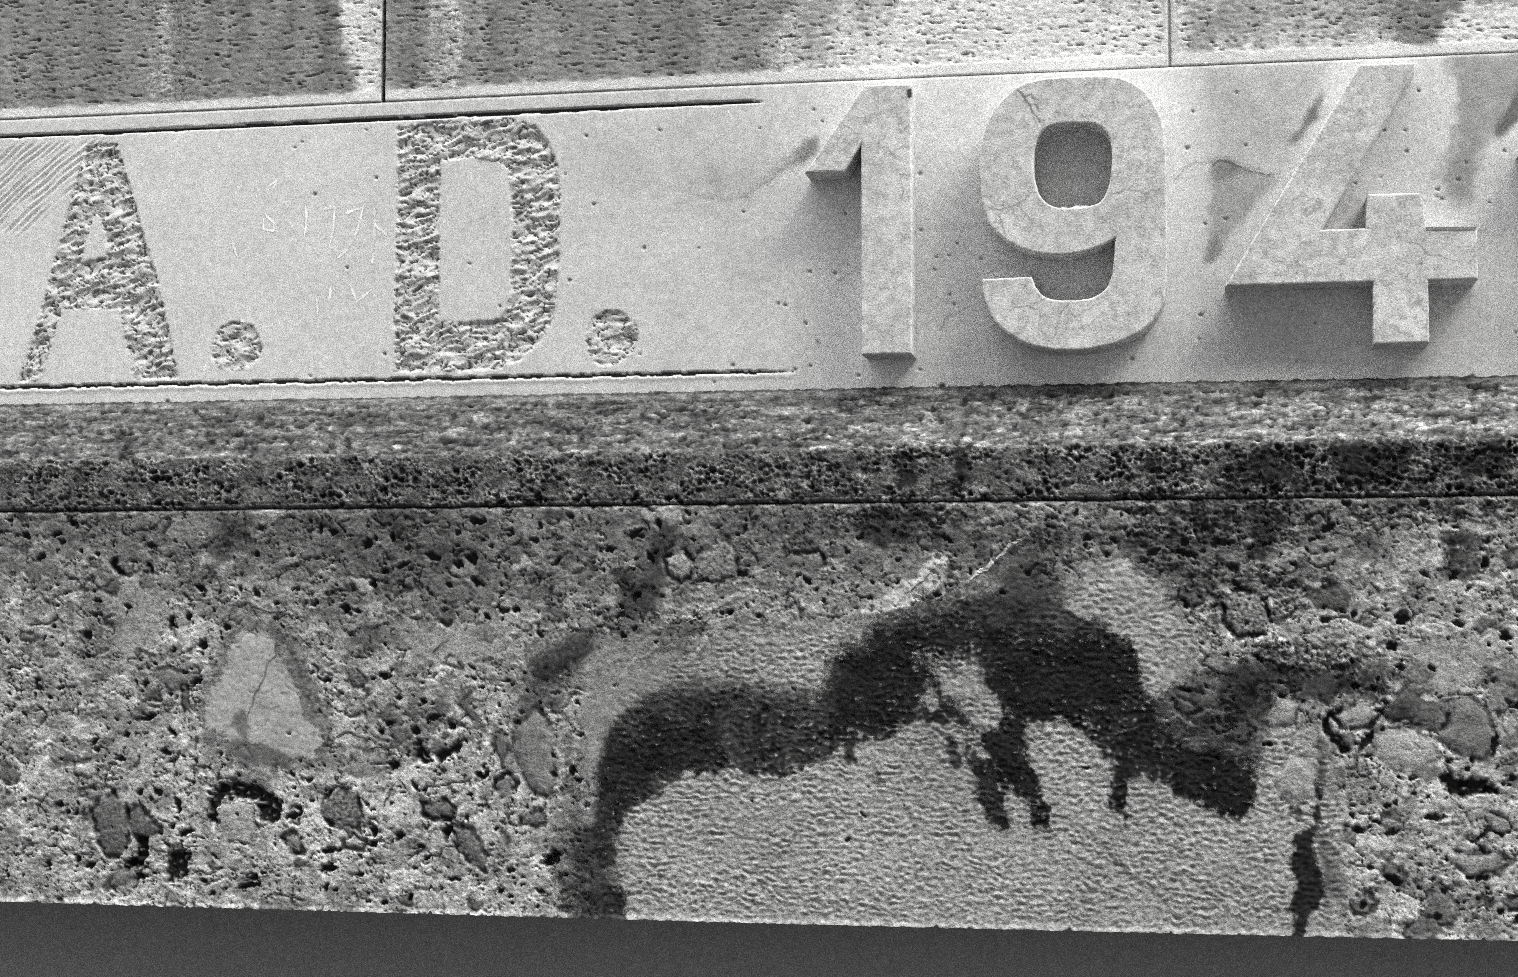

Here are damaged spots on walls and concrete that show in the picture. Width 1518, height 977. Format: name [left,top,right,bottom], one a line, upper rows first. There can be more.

damp [557,536,1273,920]
damp [1275,733,1343,937]